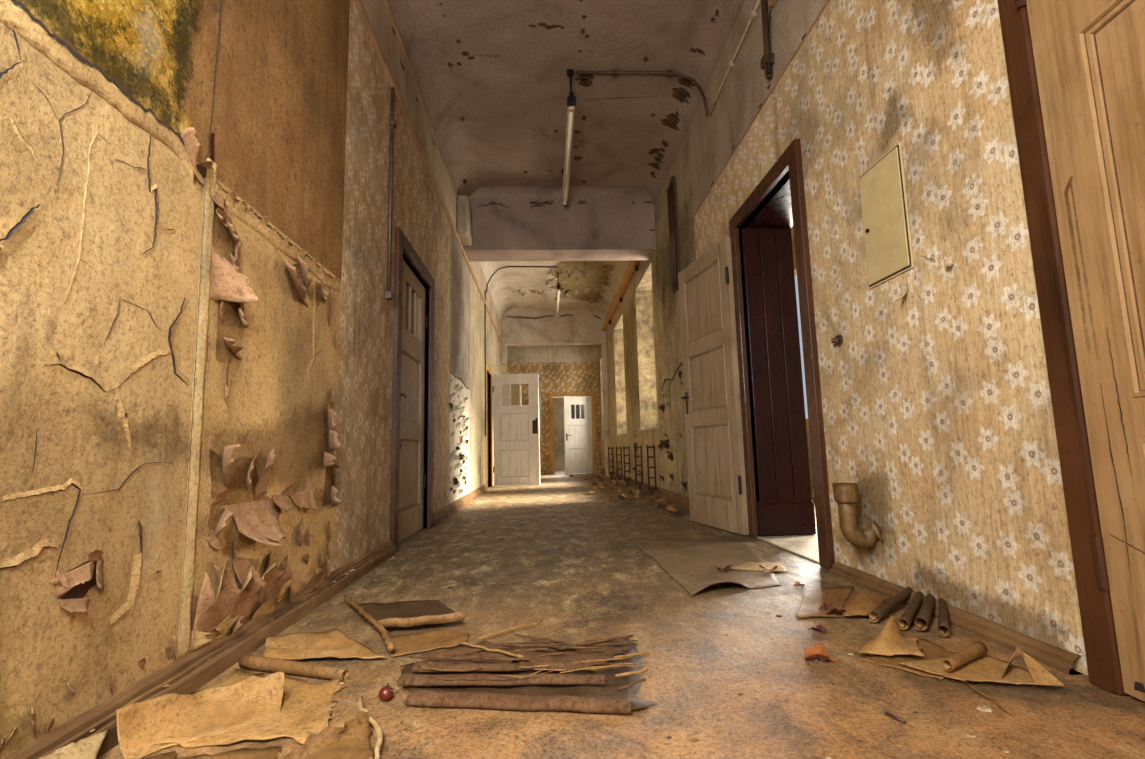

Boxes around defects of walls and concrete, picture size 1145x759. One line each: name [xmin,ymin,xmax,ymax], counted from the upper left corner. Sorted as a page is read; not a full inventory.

crack [0,23,176,304]
damp [16,0,200,157]
peeling [647,78,695,178]
peeling [513,263,614,303]
crack [0,296,190,578]
peeling [449,379,471,494]
peeling [50,549,104,614]
crack [109,518,162,625]
peeling [165,387,342,661]